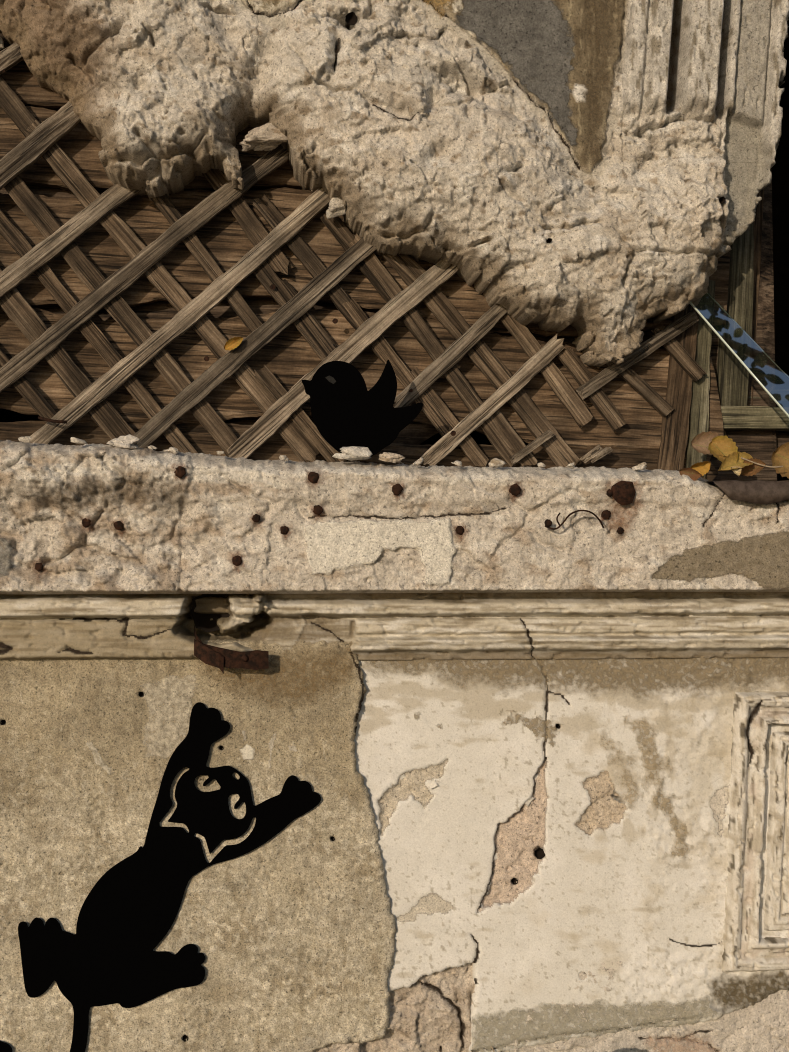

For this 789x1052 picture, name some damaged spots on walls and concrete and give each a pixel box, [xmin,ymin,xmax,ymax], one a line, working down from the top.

spalling [378,759,448,835]
spalling [479,759,548,911]
crack [471,618,570,984]
spalling [576,771,626,835]
crack [669,938,720,947]
crack [421,982,719,1052]